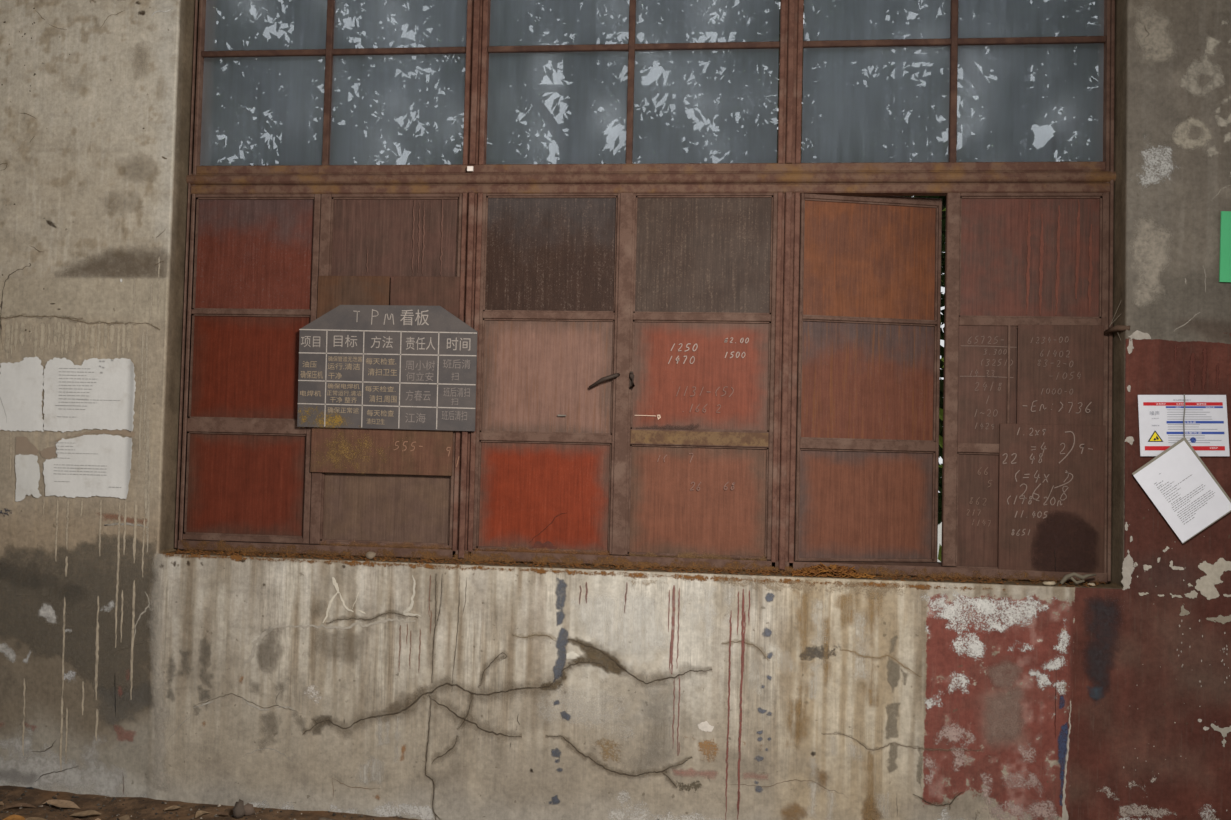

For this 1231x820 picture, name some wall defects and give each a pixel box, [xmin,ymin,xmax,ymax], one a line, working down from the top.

peeling [1127,330,1151,354]
damp [0,257,160,795]
peeling [1121,522,1231,616]
corrosion [163,540,1106,666]
peeling [924,591,1053,658]
peeling [1029,620,1070,694]
crack [199,577,708,820]
peeling [924,673,970,709]
corrosion [698,739,718,760]
peeling [923,723,975,783]
peeling [1211,723,1231,747]
peeling [1100,787,1177,818]